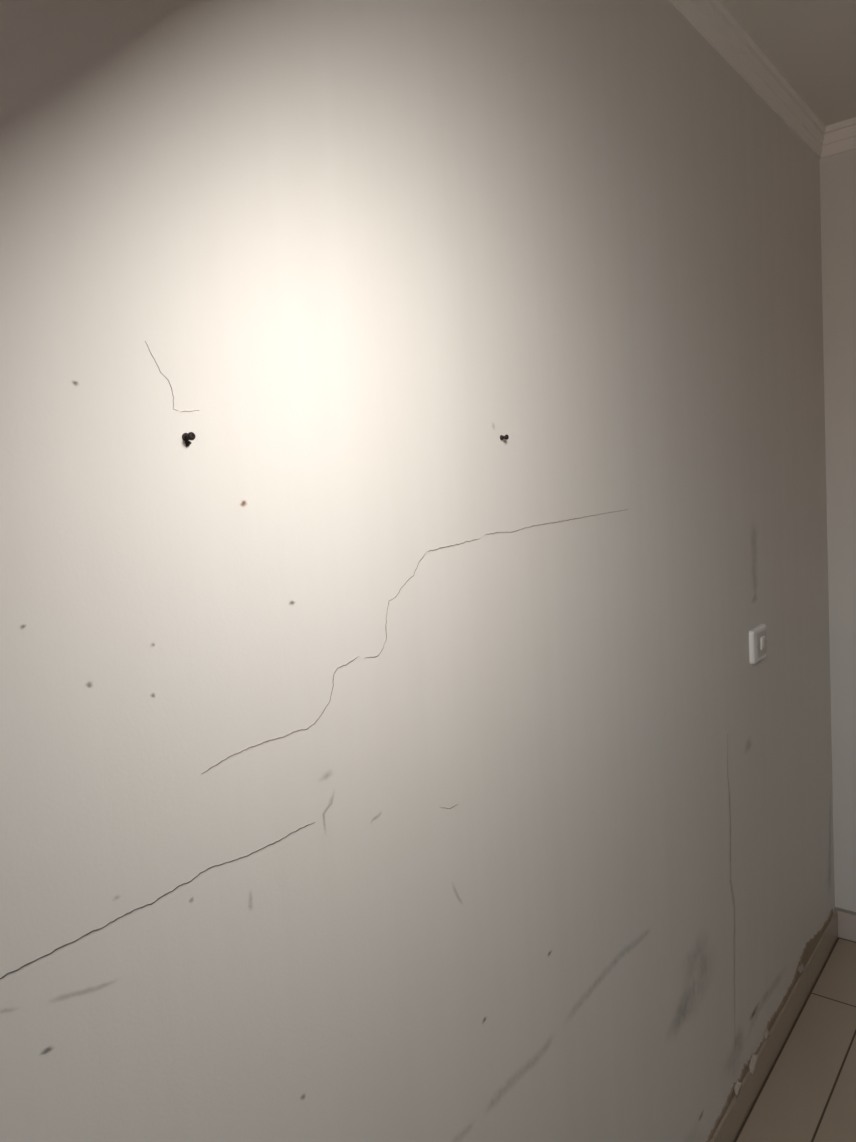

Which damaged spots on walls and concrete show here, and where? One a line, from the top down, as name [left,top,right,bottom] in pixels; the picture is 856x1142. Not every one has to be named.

crack [202,509,628,774]
crack [0,822,315,979]
peeling [706,909,833,1142]